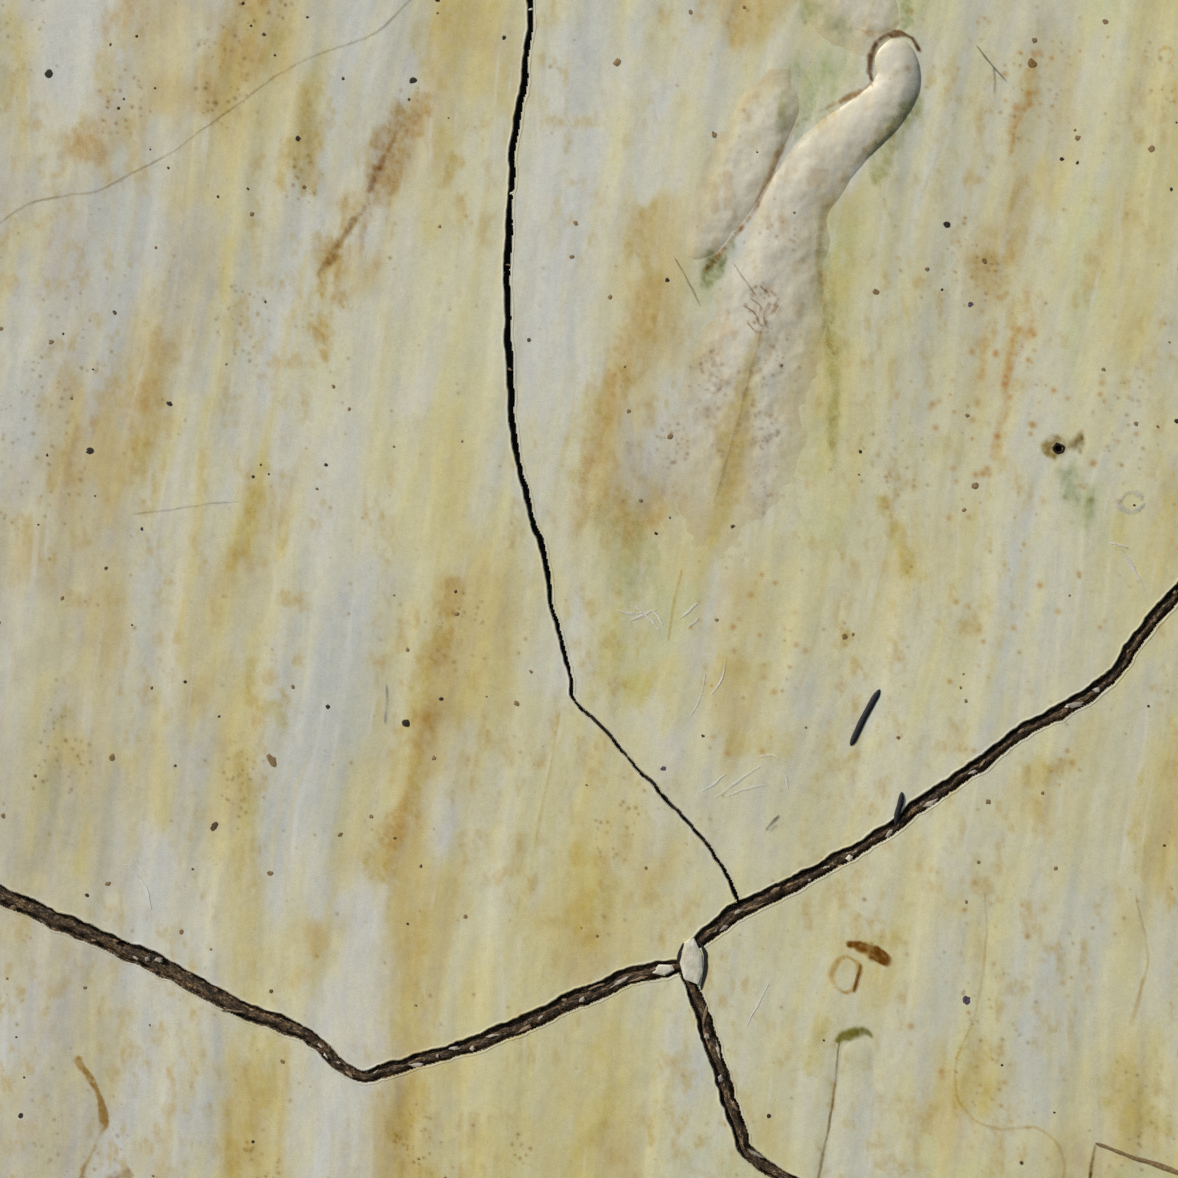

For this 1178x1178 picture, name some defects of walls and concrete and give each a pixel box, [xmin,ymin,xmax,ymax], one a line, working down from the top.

crack [501,0,1178,990]
crack [0,882,802,1178]
corrosion [847,941,889,992]
crack [1089,1142,1178,1178]